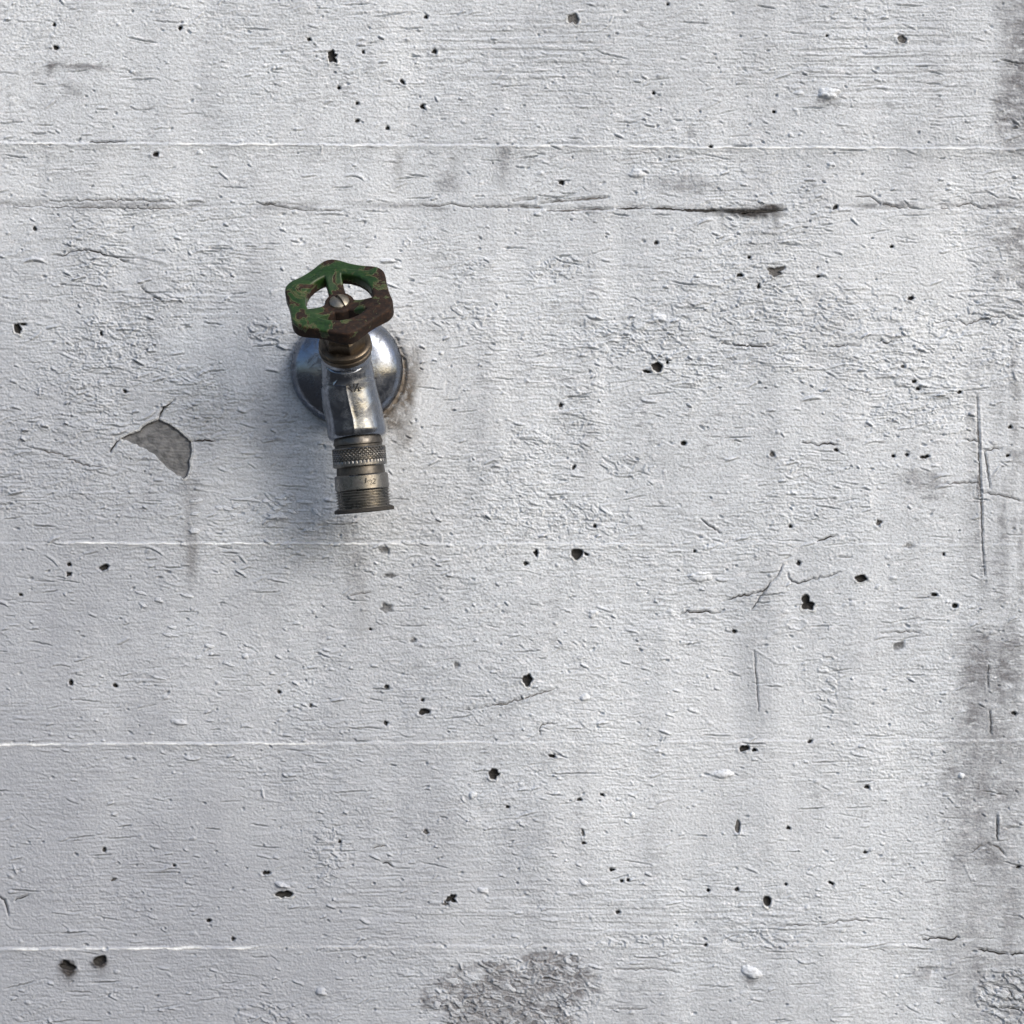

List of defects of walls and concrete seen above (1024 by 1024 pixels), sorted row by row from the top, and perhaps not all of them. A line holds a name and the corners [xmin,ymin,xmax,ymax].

crack [425,197,783,213]
spalling [110,401,213,481]
crack [952,408,1019,574]
crack [685,536,850,614]
peeling [420,952,598,1024]